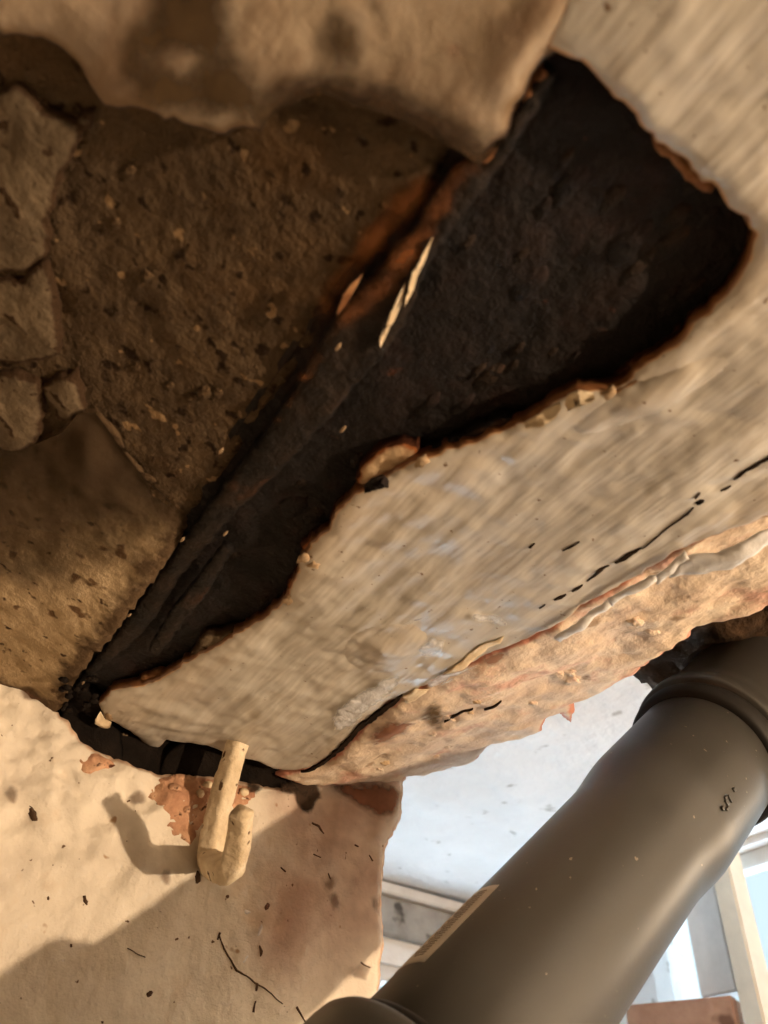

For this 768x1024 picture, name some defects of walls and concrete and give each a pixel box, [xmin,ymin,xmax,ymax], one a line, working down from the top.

corrosion [351,182,422,264]
flaking render [0,34,451,515]
corrosion [342,230,432,322]
peeling [524,390,595,429]
crack [539,456,768,609]
flaking render [275,515,768,786]
peeling [94,711,112,728]
flaking render [79,753,115,774]
flaking render [148,774,214,845]
flaking render [232,784,255,809]